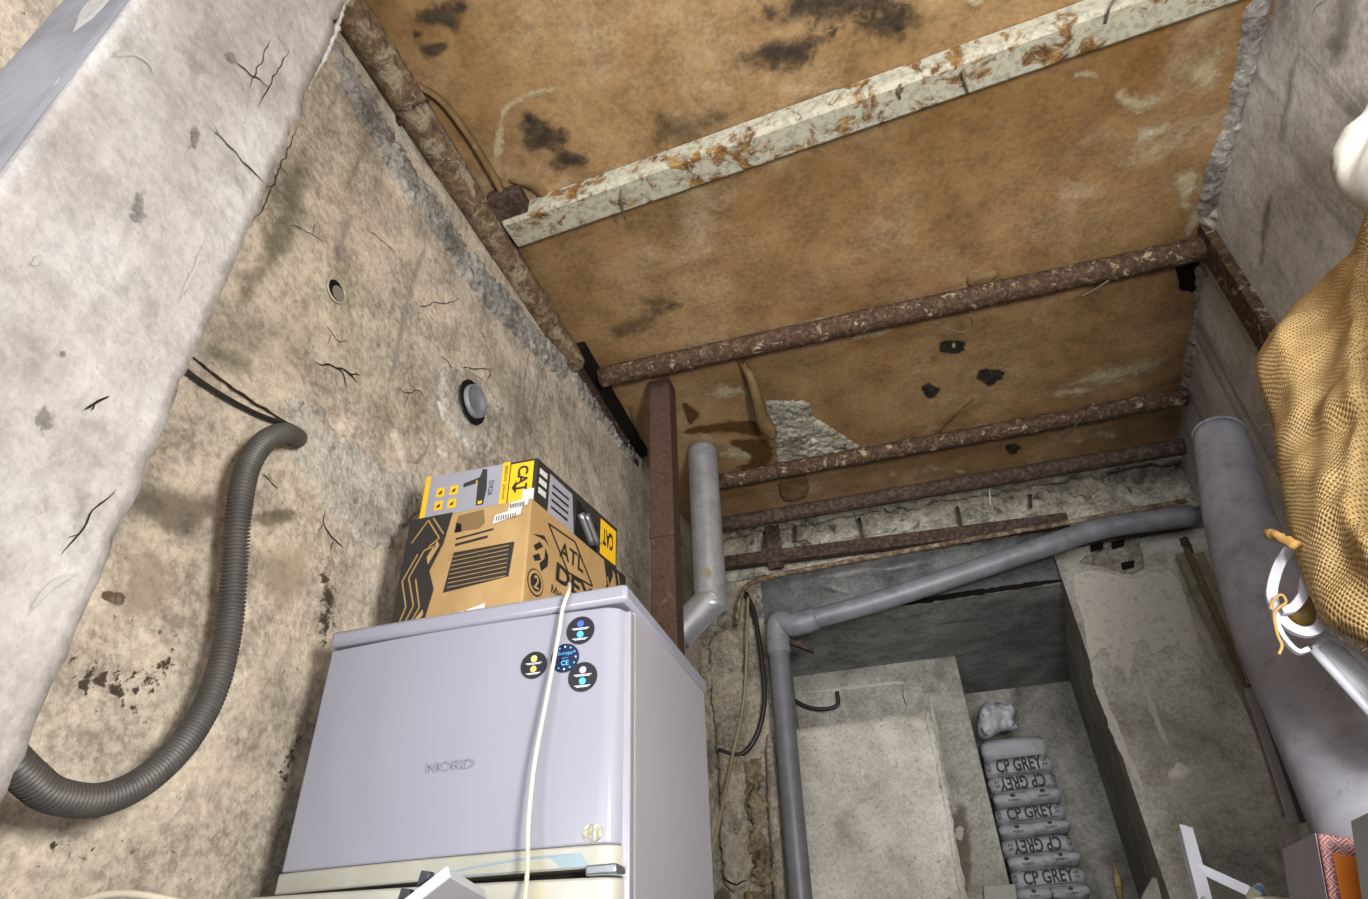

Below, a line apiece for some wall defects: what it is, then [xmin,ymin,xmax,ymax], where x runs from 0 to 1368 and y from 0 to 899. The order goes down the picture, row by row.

crack [236,40,290,105]
mould [413,1,467,56]
leakage [742,0,919,70]
leakage [494,87,587,169]
crack [193,356,287,422]
spalling [739,361,859,502]
spalling [723,456,1181,551]
mould [64,634,177,714]